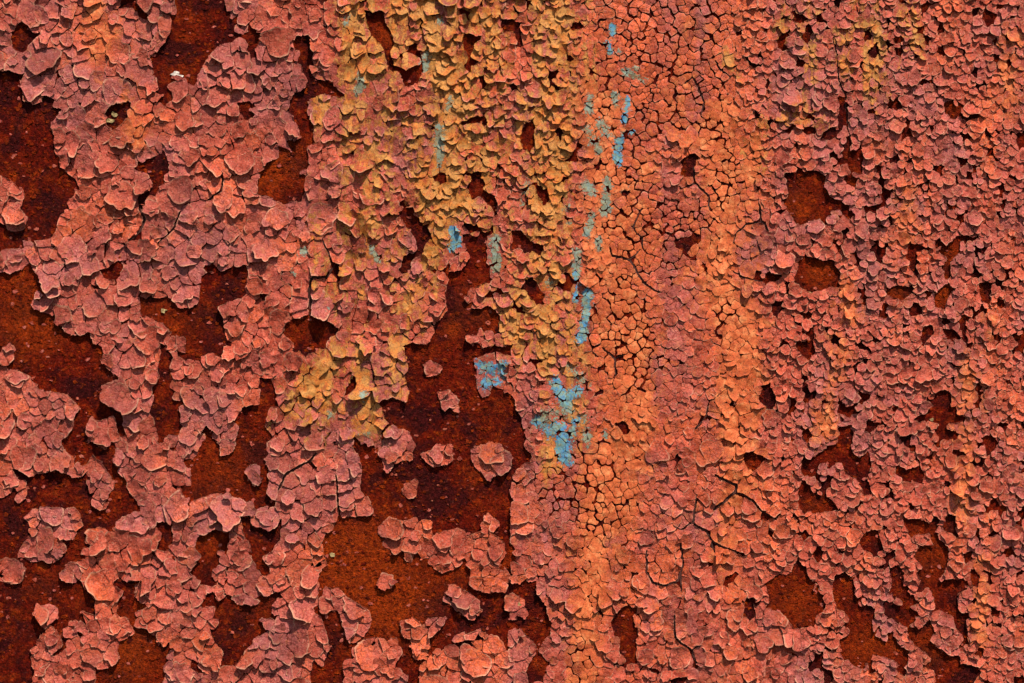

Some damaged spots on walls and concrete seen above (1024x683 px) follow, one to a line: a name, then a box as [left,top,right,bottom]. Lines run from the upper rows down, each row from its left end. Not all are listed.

corrosion [77,0,122,63]
peeling [354,27,368,55]
corrosion [996,25,1024,118]
peeling [611,190,641,214]
crack [610,209,659,292]
crack [733,205,768,244]
corrosion [266,0,926,683]
corrosion [939,352,988,525]
peeling [575,484,593,522]
crack [646,474,770,591]
crack [674,615,702,663]
corrosion [968,554,993,649]